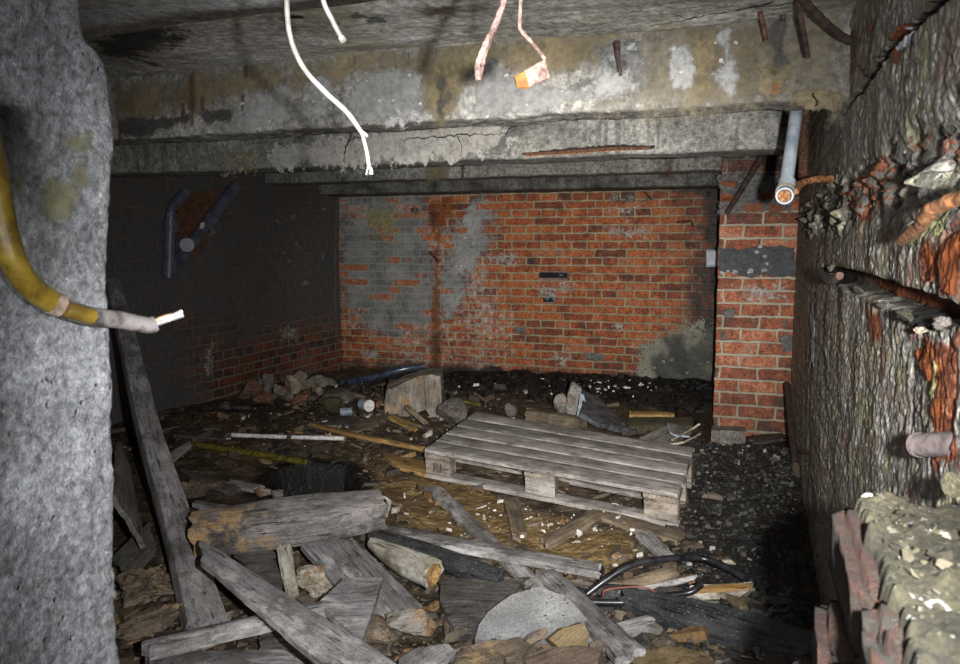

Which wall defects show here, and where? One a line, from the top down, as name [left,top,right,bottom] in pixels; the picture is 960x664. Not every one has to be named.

water stain [90,27,194,62]
water stain [118,33,627,139]
water stain [638,14,841,115]
crack [401,126,516,156]
spalling [810,102,960,231]
corrosion [425,197,456,367]
water stain [653,327,716,381]
spalling [823,209,960,428]